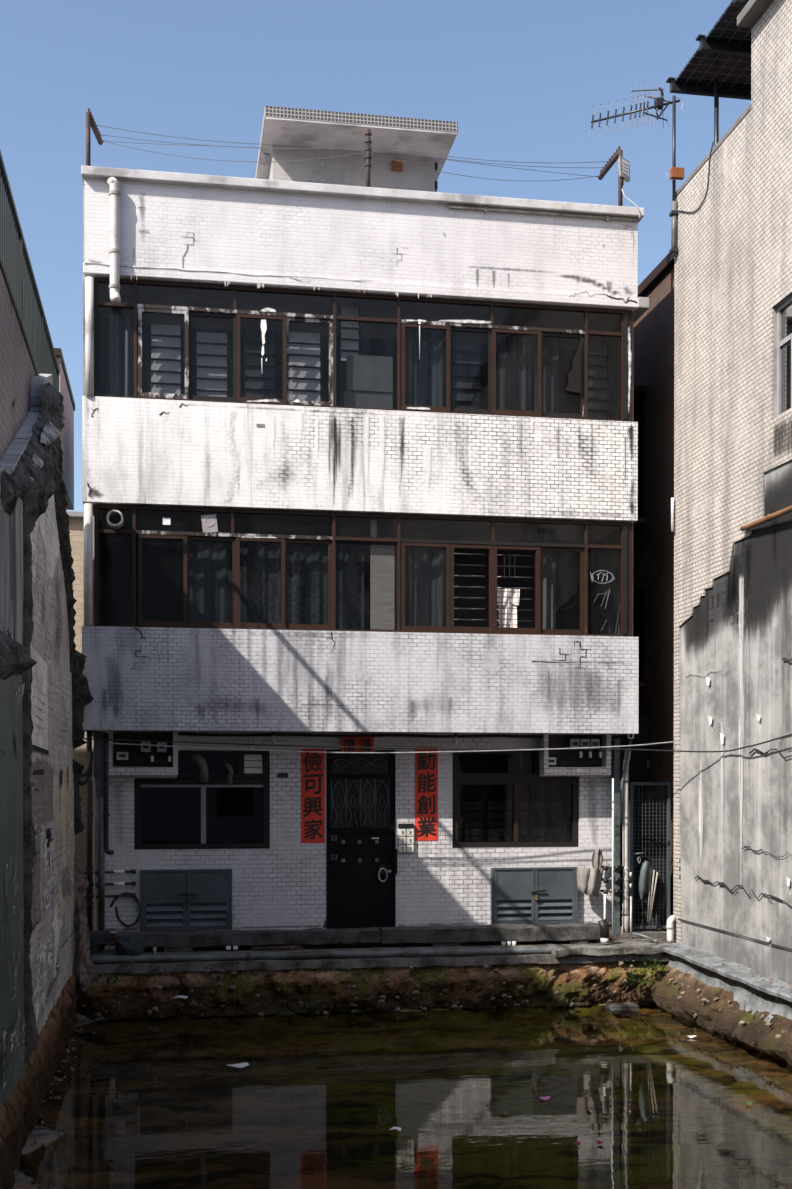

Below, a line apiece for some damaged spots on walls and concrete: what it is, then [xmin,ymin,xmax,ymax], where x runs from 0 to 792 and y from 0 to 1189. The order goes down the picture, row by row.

crack [569,291,637,303]
leakage [774,421,792,456]
leakage [329,418,353,498]
crack [532,641,627,677]
leakage [685,468,792,851]
crack [749,748,792,759]